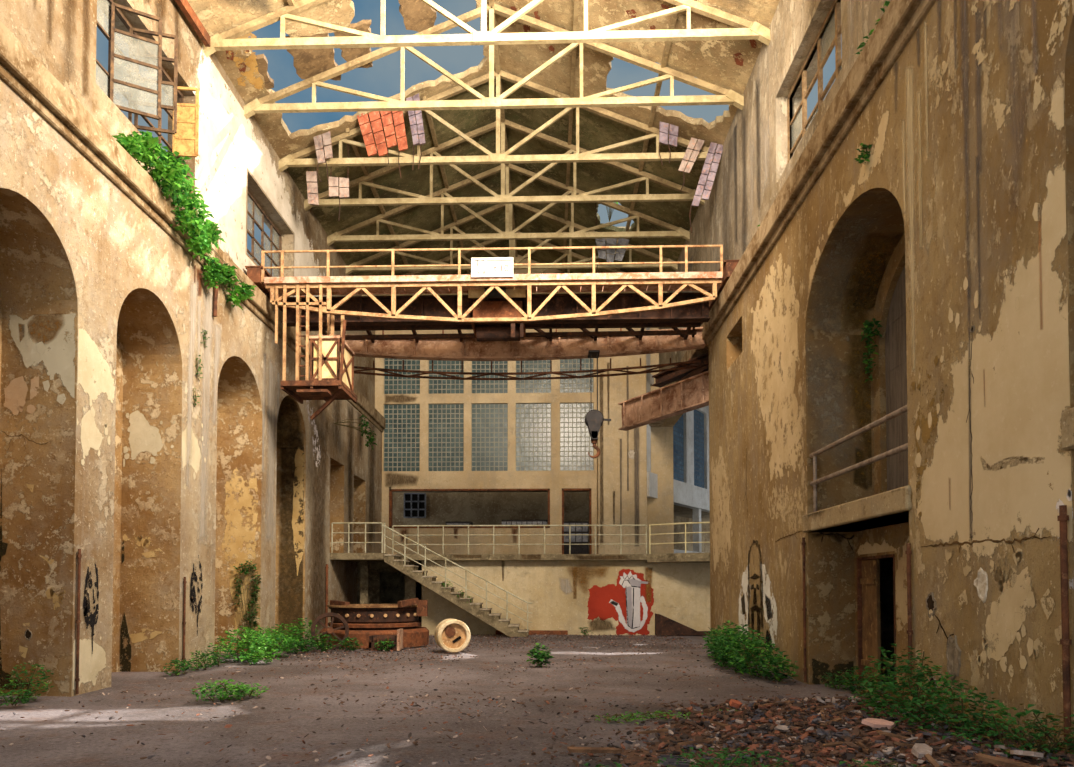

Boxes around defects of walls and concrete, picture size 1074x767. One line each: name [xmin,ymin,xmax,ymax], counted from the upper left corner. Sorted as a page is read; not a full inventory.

peeling [928,47,955,109]
peeling [971,37,988,66]
peeling [971,0,1017,15]
peeling [993,98,1011,130]
peeling [1033,75,1064,130]
peeling [1046,0,1068,56]
damp [895,23,940,368]
damp [954,0,985,430]
peeling [751,106,892,535]
crack [921,327,1054,552]
peeling [910,146,1073,679]
peeling [129,628,162,644]